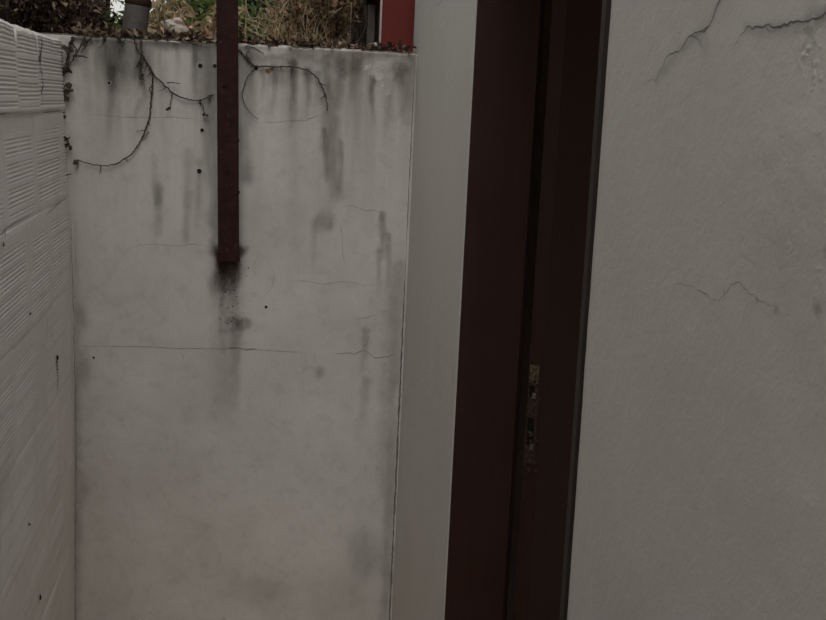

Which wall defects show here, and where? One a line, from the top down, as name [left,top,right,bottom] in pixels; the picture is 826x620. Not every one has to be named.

crack [642,0,720,86]
crack [738,12,826,40]
rust [213,246,249,309]
crack [0,187,296,620]